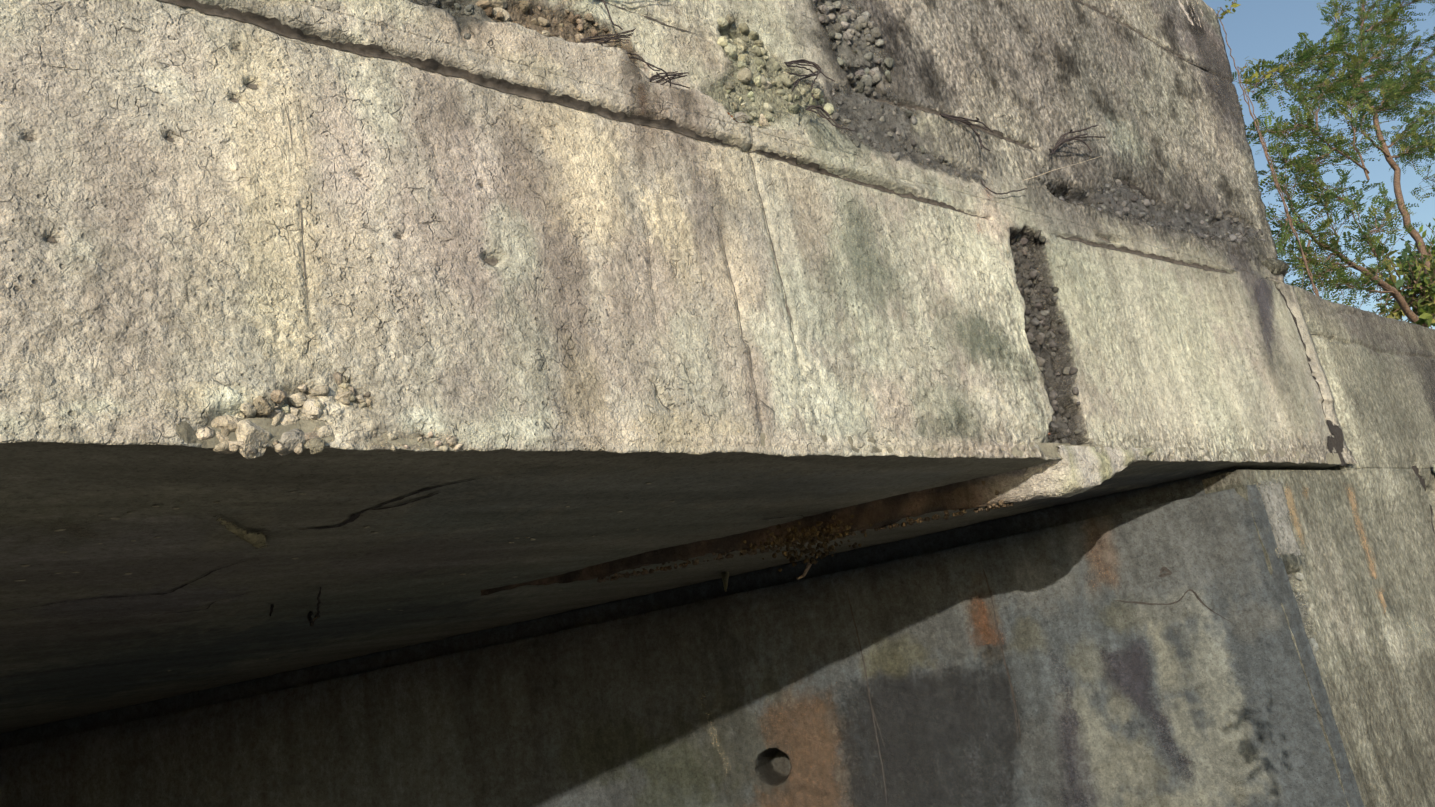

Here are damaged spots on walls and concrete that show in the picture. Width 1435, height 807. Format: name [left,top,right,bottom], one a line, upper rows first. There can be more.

spalling [717,0,985,184]
leakage [1178,0,1243,122]
crack [159,0,987,371]
spalling [195,372,373,459]
crack [299,477,486,530]
crack [715,215,775,429]
spalling [481,228,1154,596]